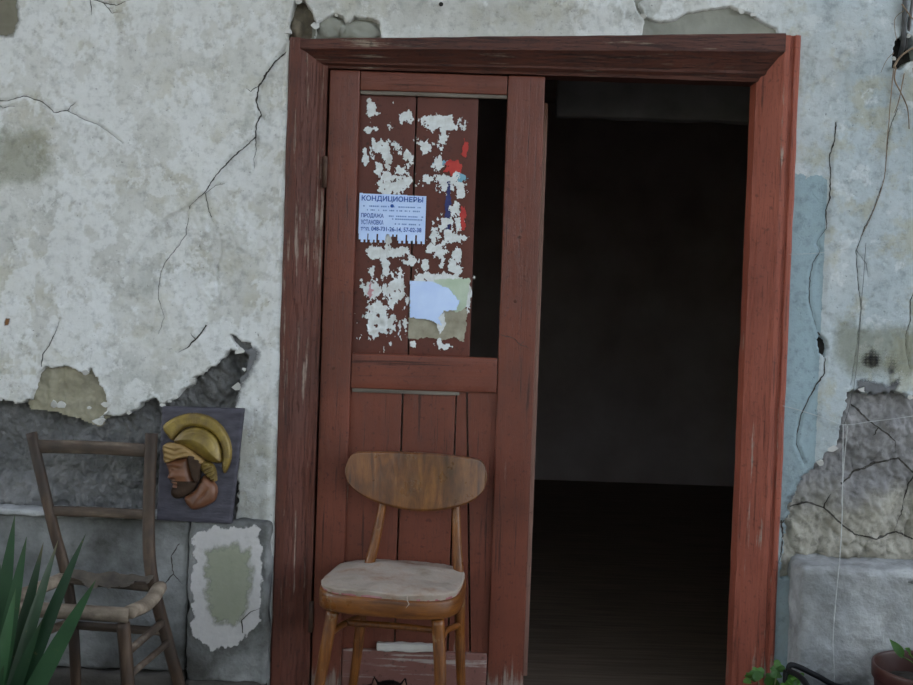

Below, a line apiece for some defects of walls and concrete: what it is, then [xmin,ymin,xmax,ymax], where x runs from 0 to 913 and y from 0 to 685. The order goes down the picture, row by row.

flaking render [284,0,381,40]
crack [0,96,115,137]
crack [158,52,286,331]
crack [796,122,837,462]
flaking render [0,335,252,509]
crack [778,404,913,563]
flaking render [780,387,913,577]